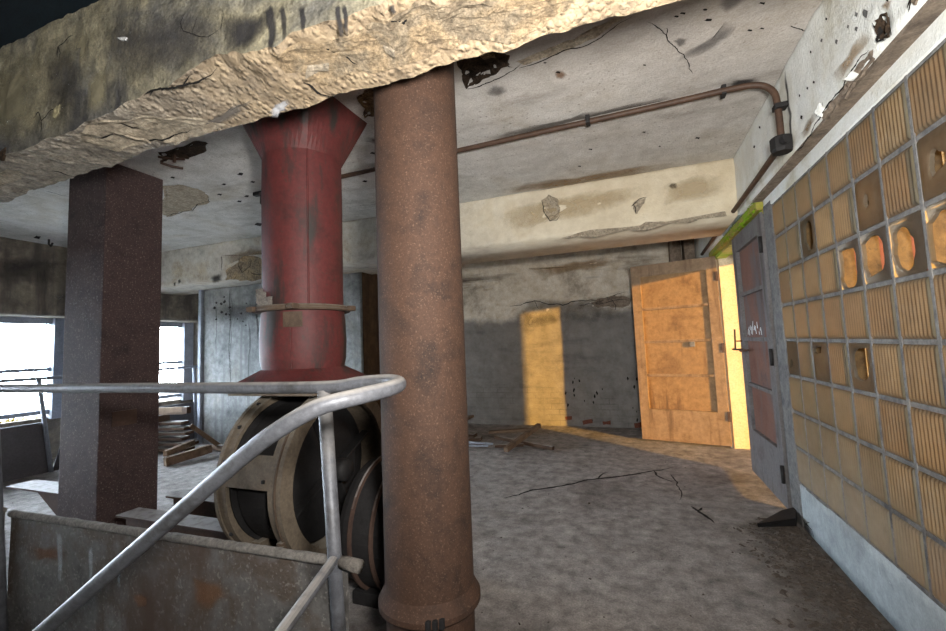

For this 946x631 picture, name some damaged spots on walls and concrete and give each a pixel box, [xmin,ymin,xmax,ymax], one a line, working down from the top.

crack [144,68,217,96]
spalling [357,88,374,118]
crack [648,22,692,72]
spalling [814,0,891,120]
spalling [80,115,227,217]
spalling [533,195,607,221]
spalling [226,256,262,281]
water stain [216,294,258,379]
crack [506,466,714,522]